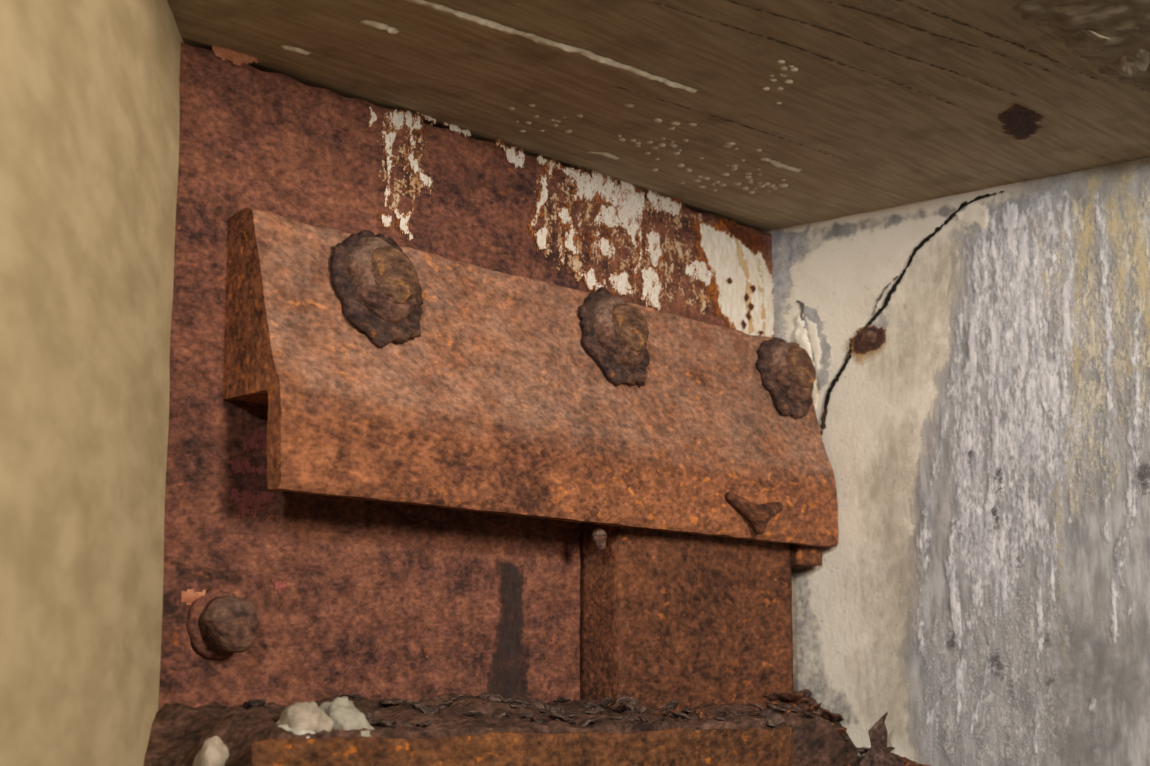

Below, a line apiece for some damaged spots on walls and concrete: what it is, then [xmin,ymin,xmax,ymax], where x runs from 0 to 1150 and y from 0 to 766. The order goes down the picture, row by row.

spalling [1012,0,1150,93]
rust [847,312,889,364]
crack [820,191,1004,436]
damp [872,163,1150,766]
rust [242,699,270,709]
rust [339,692,696,729]
rust [747,702,823,727]